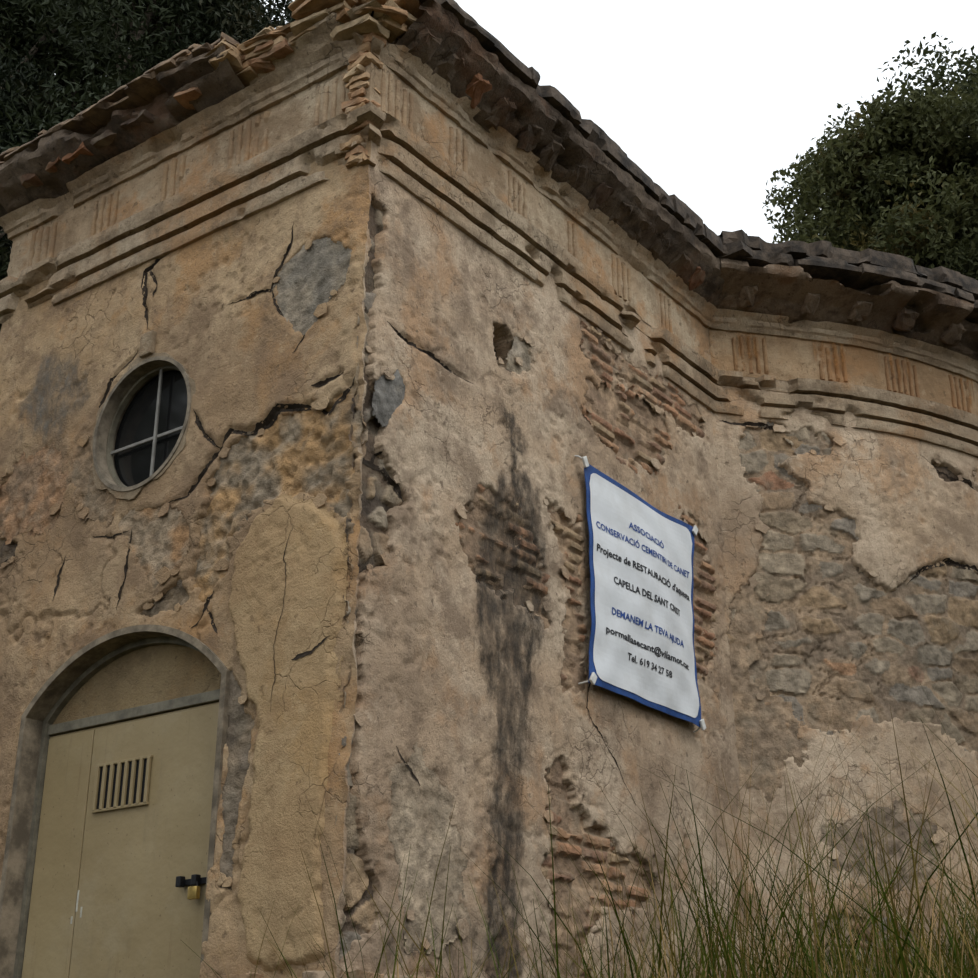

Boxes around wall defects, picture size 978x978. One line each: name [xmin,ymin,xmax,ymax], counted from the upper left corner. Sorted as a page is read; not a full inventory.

crack [141,259,160,328]
spalling [0,204,405,623]
crack [227,222,294,317]
crack [169,367,360,503]
spalling [580,320,707,475]
crack [93,529,132,610]
crack [270,530,330,711]
water stain [476,412,545,978]
spalling [455,484,588,694]
spalling [678,422,978,803]
peeling [387,742,472,957]
spalling [541,758,653,978]